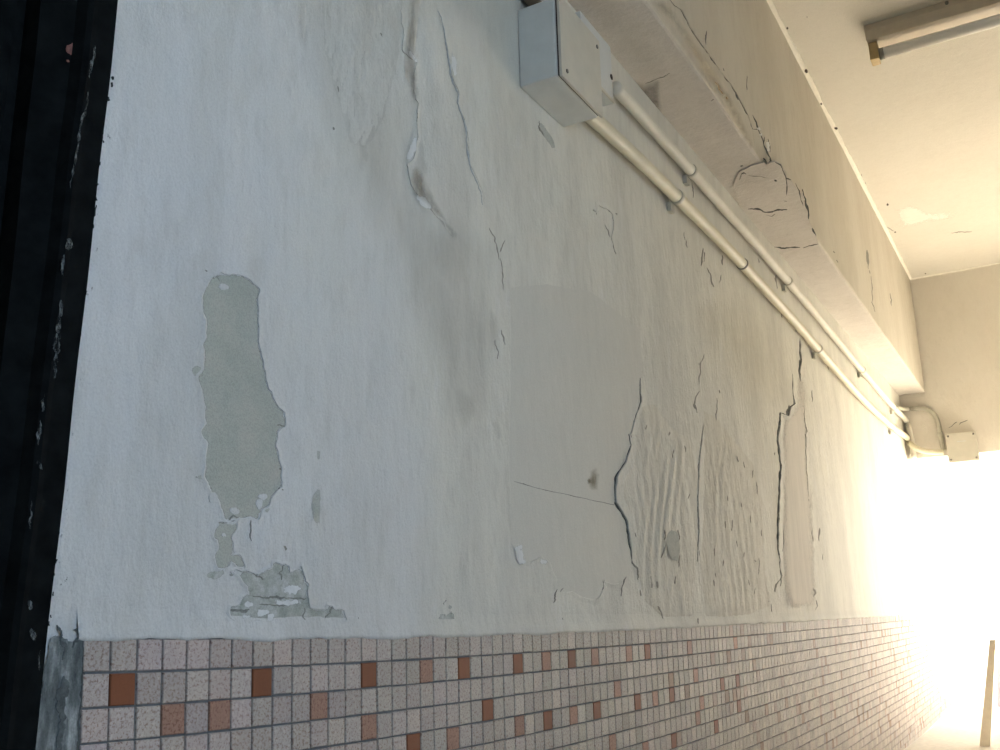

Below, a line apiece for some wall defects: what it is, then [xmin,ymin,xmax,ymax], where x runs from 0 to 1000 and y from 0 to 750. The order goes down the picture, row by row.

crack [670,0,838,262]
crack [866,250,892,311]
peeling [192,268,359,622]
crack [514,378,649,596]
crack [768,338,823,611]